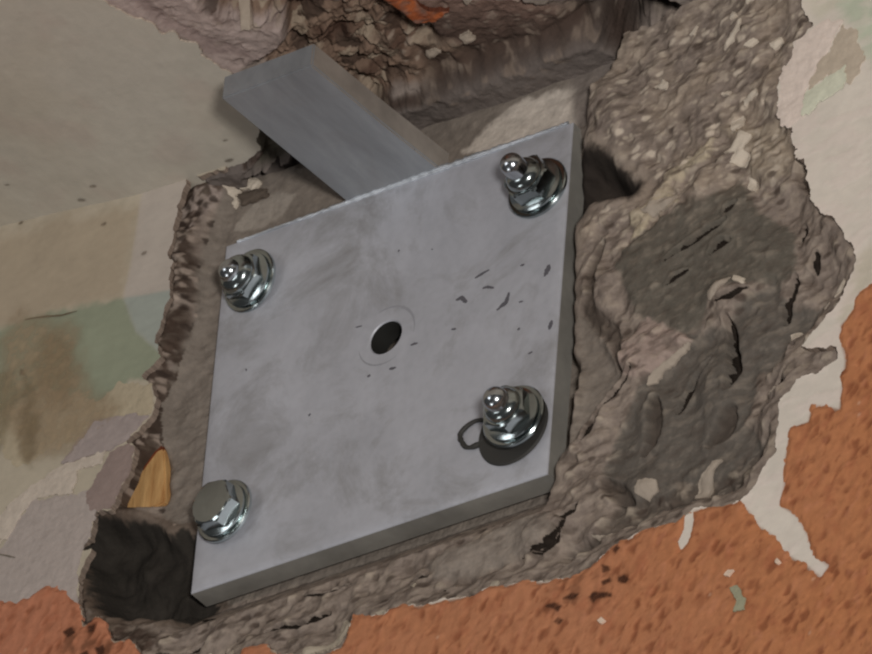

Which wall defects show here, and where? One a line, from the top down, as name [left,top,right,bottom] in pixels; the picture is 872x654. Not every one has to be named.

spalling [106,0,602,107]
flaking render [251,129,270,162]
spalling [513,0,866,583]
peeling [0,177,270,604]
crack [522,504,577,559]
spalling [82,503,547,654]
spalling [546,593,578,623]
spalling [590,592,611,602]
peeling [724,569,746,612]